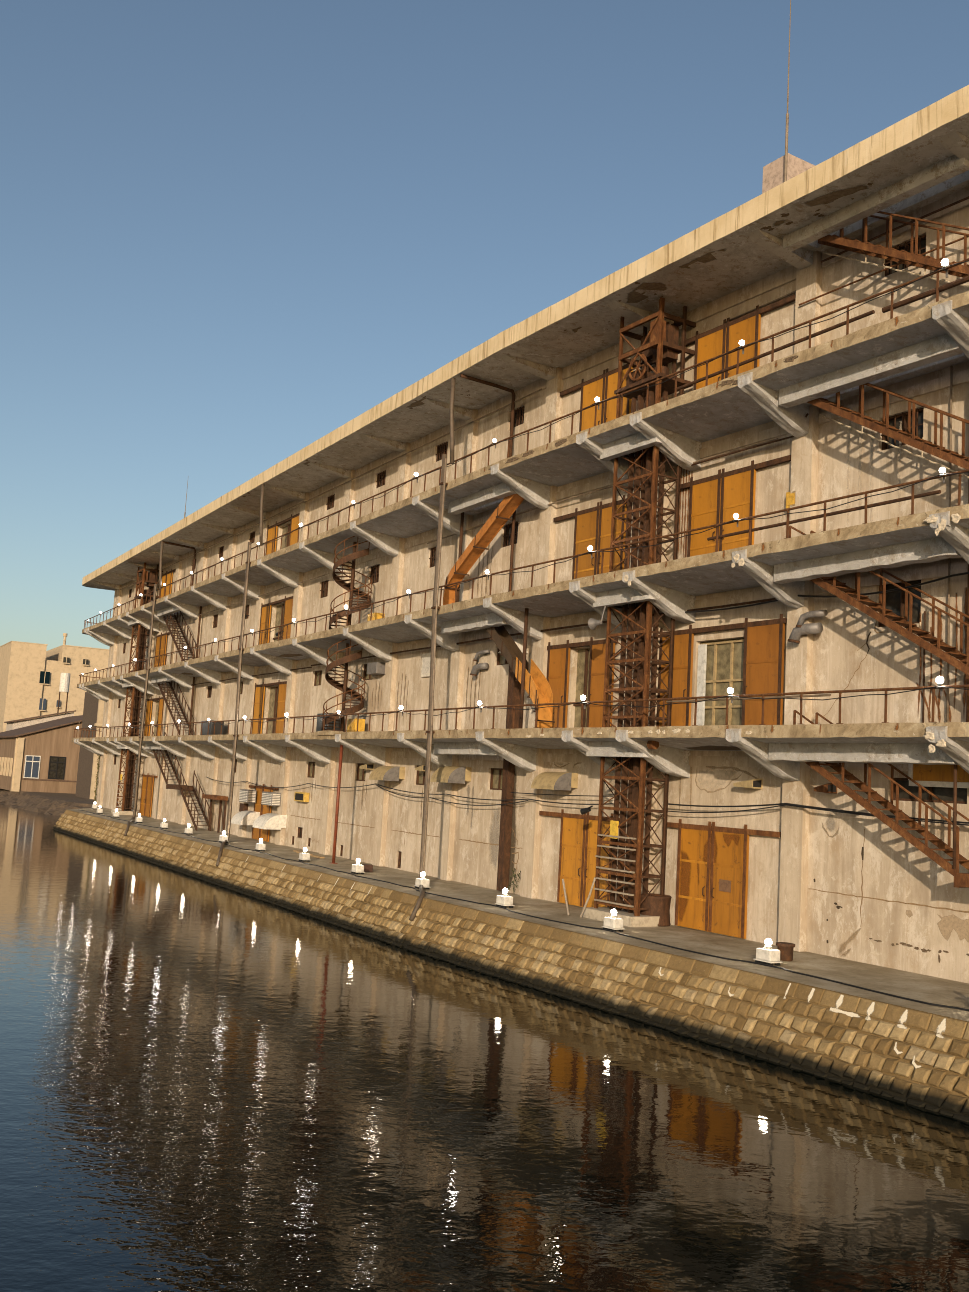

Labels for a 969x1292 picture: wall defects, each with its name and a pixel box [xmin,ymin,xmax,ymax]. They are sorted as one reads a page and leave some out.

spalling [760,213,793,231]
spalling [805,183,873,217]
rust [916,587,967,722]
peeling [869,915,969,963]